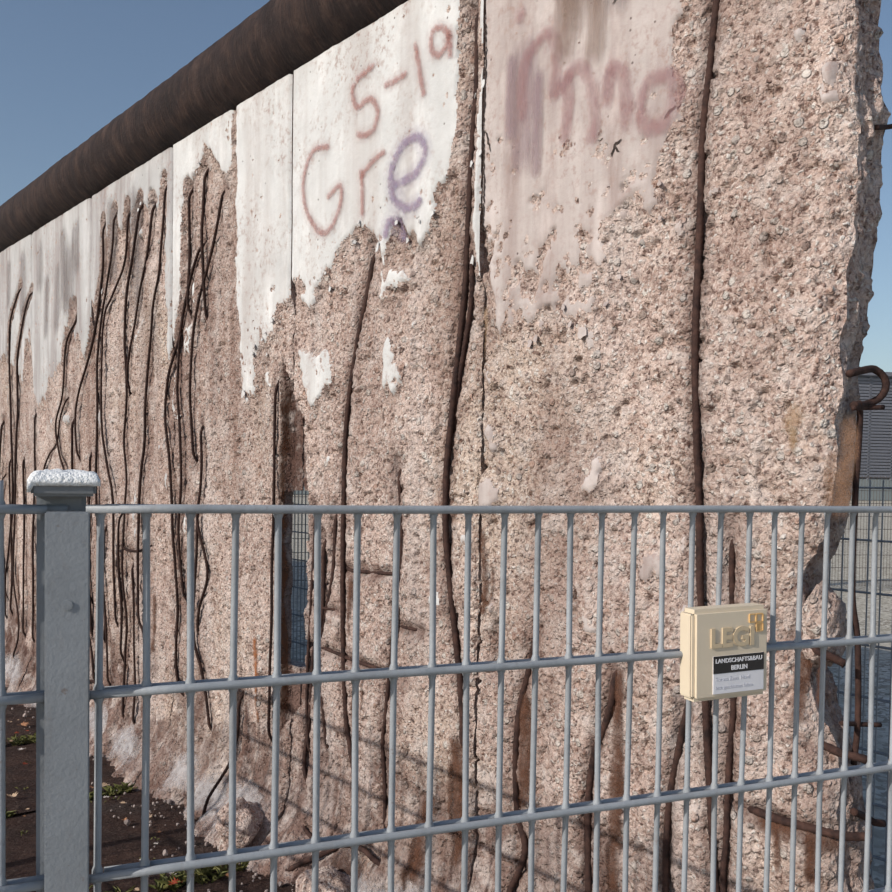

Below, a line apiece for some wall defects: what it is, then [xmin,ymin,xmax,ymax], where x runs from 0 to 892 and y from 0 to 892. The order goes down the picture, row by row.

spalling [0,0,890,693]
corrosion [279,389,292,674]
corrosion [280,685,289,714]
spalling [89,645,886,848]
spalling [246,778,865,892]
corrosion [792,652,820,721]